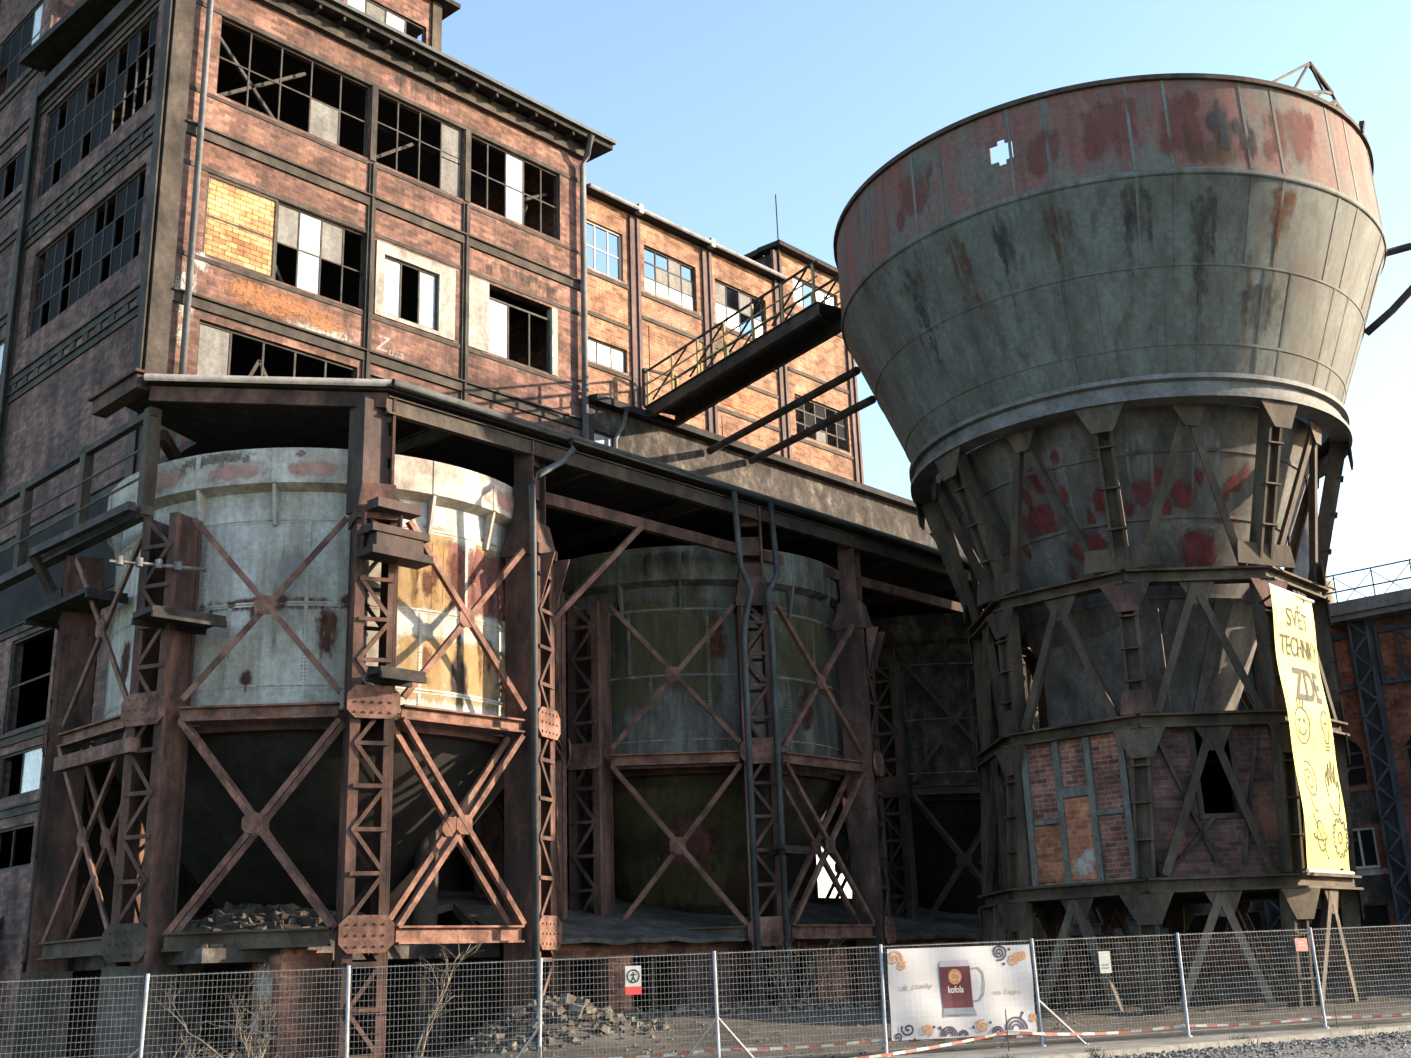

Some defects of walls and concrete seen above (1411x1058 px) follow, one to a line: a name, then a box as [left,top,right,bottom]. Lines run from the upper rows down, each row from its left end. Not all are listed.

corrosion [1269,188,1296,247]
spalling [156,451,265,491]
peeling [289,450,337,475]
peeling [485,489,514,512]
corrosion [398,527,453,612]
corrosion [199,597,256,617]
corrosion [274,595,348,656]
corrosion [396,635,505,713]